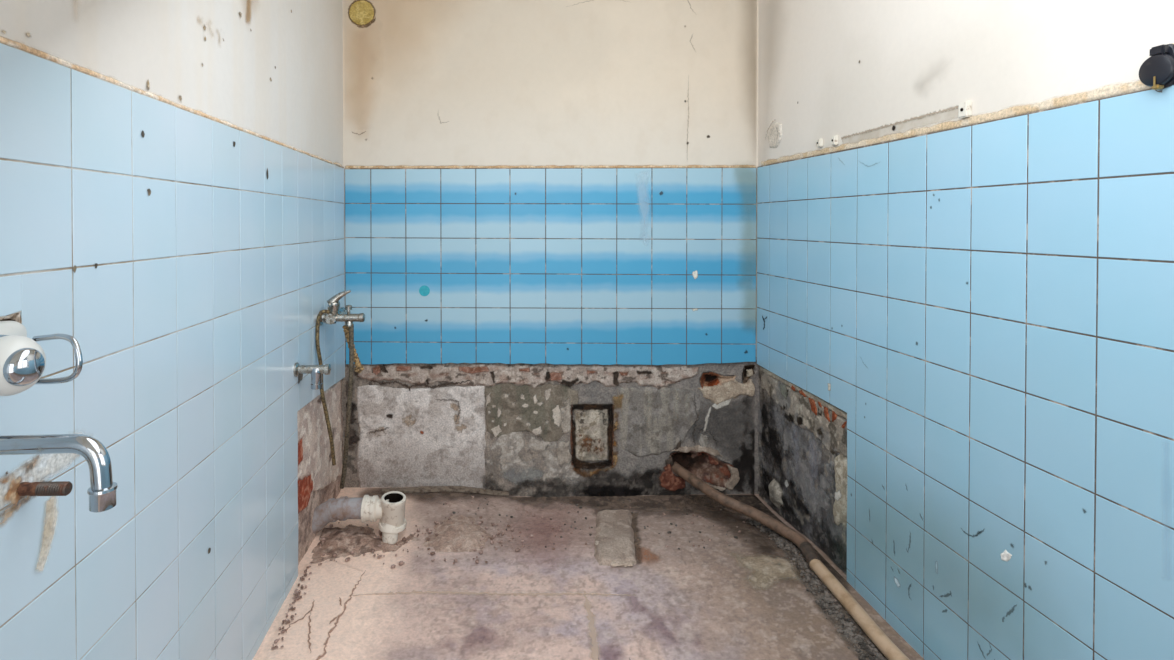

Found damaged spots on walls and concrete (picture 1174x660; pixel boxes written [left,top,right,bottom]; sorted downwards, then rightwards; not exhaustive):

peeling [451,403,467,432]
peeling [459,366,489,374]
peeling [485,368,579,466]
flaking render [617,372,740,491]
spalling [760,366,847,457]
water stain [690,393,847,572]
crack [286,570,366,660]